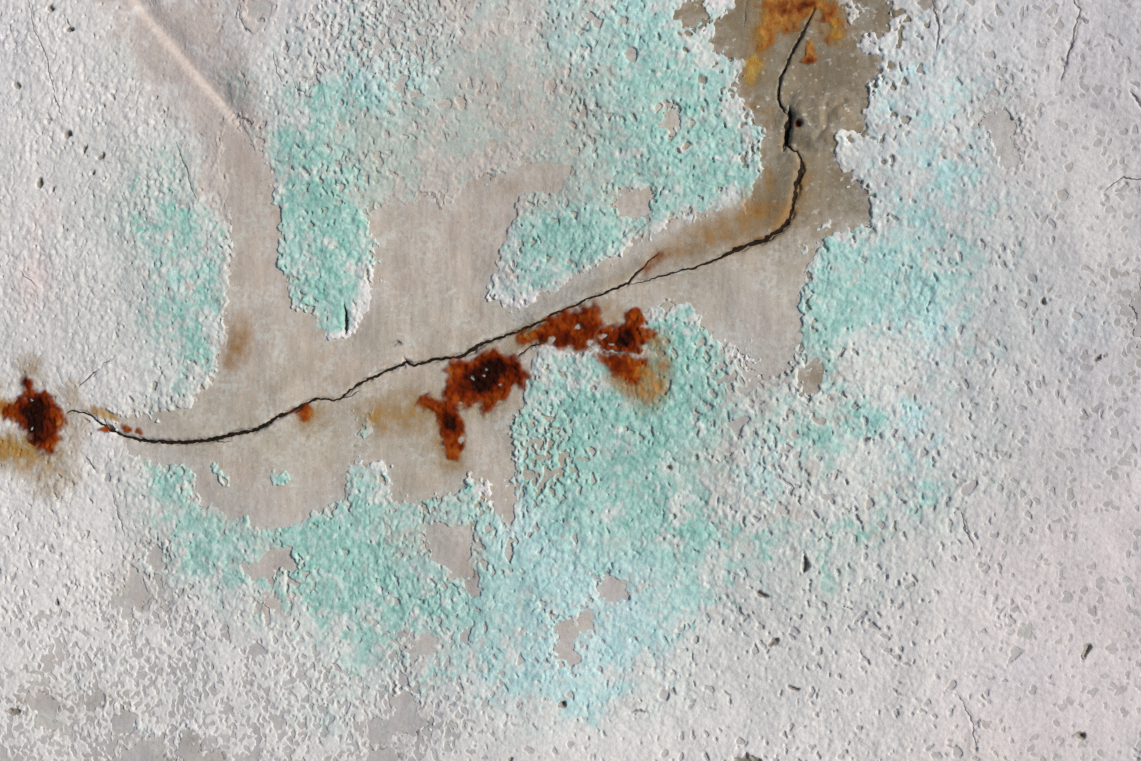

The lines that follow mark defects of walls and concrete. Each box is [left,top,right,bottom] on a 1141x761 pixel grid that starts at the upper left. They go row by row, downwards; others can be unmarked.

corrosion [745,0,844,85]
crack [68,11,814,445]
flaking render [105,0,893,581]
corrosion [0,371,67,476]
corrosion [92,407,143,435]
corrosion [368,302,669,466]